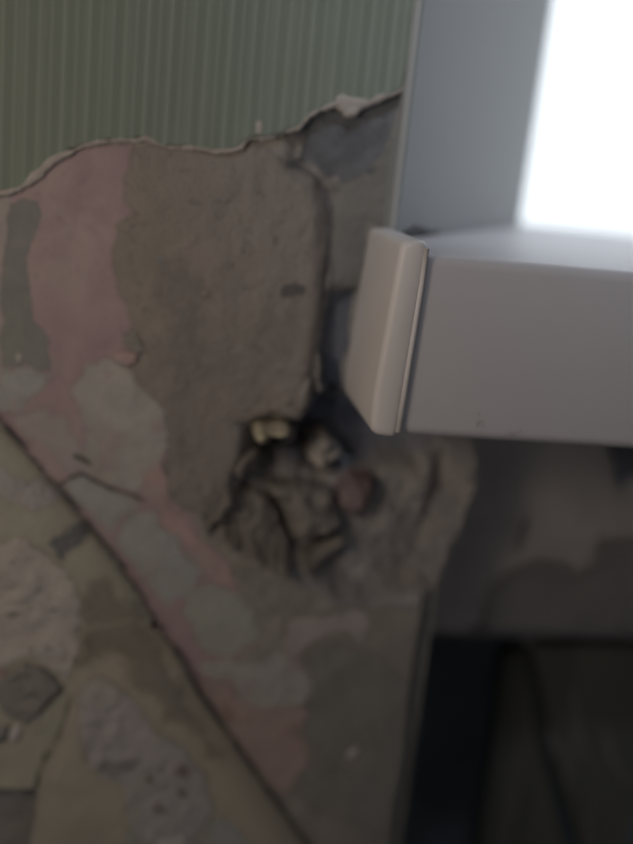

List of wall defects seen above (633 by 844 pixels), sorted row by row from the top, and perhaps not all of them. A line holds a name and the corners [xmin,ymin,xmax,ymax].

spalling [202,378,479,670]